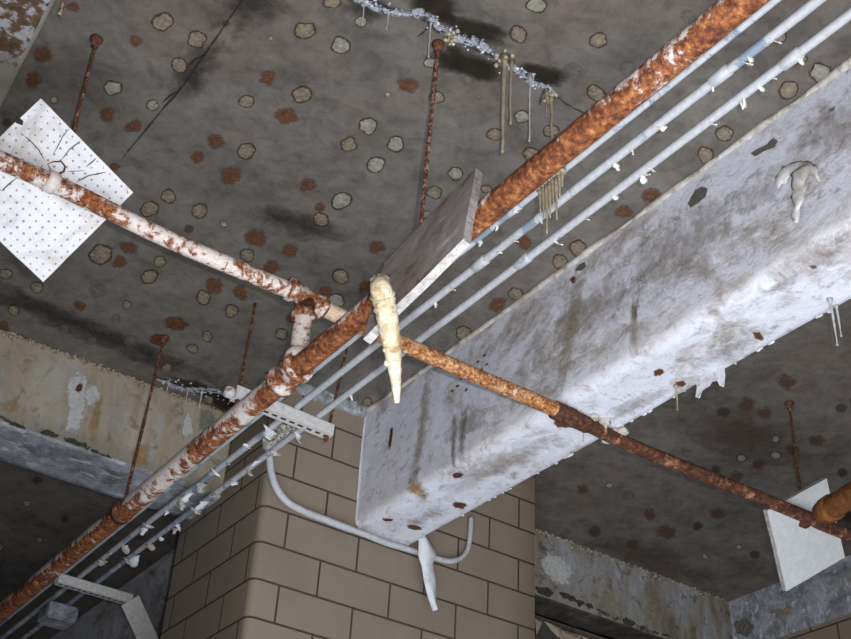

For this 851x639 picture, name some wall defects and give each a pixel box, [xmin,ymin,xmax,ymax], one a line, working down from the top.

peeling [0,0,50,68]
water stain [413,0,506,80]
water stain [519,64,563,85]
corrosion [275,108,299,124]
corrosion [208,134,223,149]
corrosion [220,168,241,185]
peeling [775,160,820,225]
corrosion [244,229,266,246]
corrosion [113,242,137,268]
corrosion [263,261,280,274]
corrosion [150,317,189,345]
peeling [65,371,101,432]